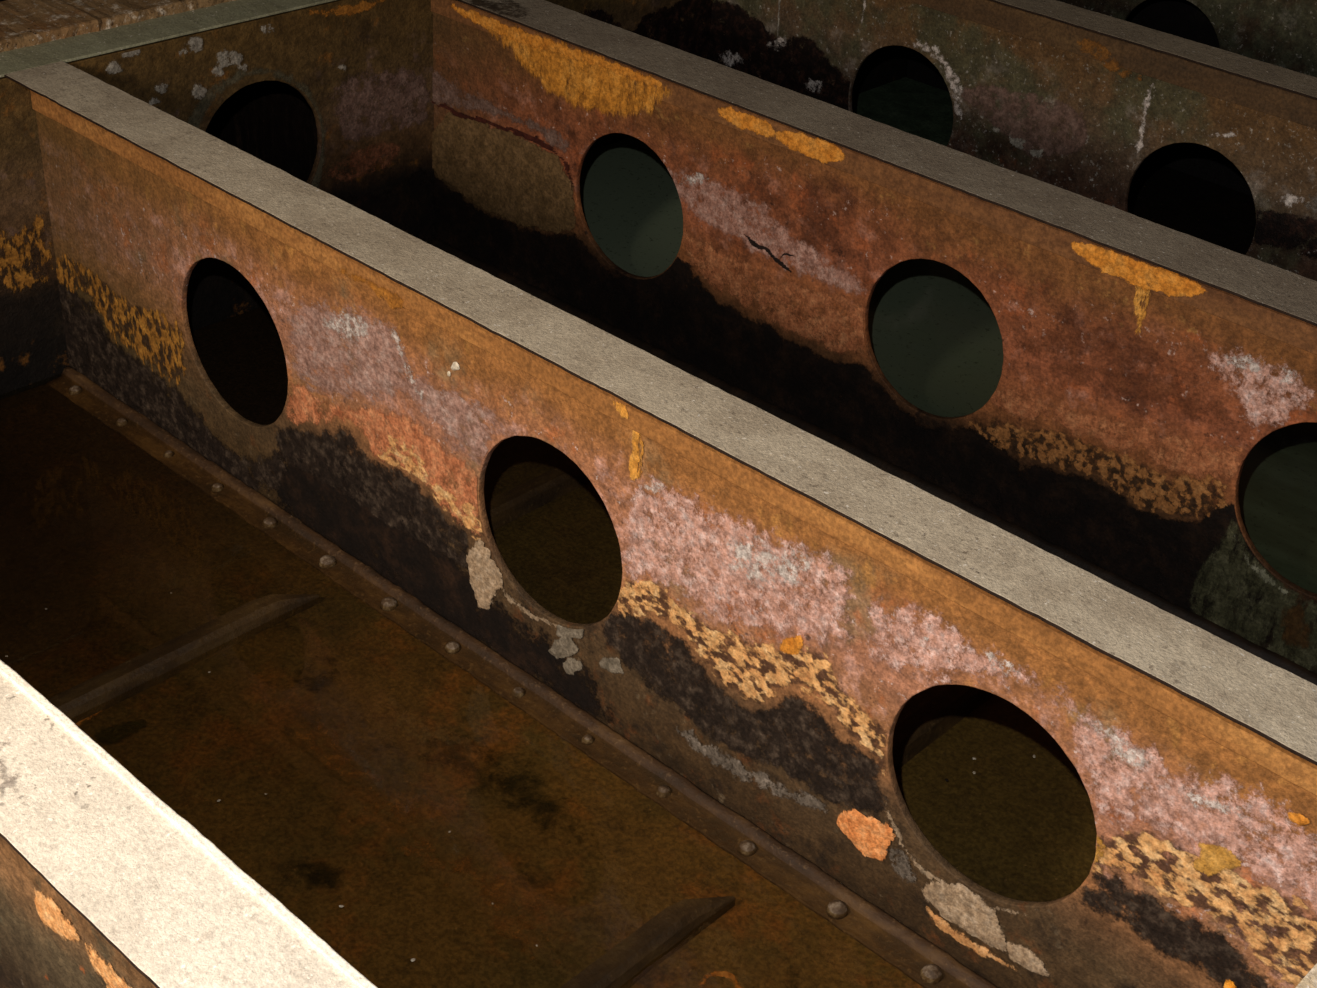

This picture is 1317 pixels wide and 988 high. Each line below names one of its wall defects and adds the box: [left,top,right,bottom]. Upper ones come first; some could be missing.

spalling [584,0,850,111]
spalling [589,133,632,151]
crack [744,234,793,273]
corrosion [1017,242,1227,423]
corrosion [286,384,482,540]
water stain [337,168,1317,670]
peeling [466,539,503,610]
corrosion [617,580,887,774]
water stain [603,475,1317,904]
corrosion [837,803,941,882]
peeling [921,879,1049,976]
corrosion [1091,830,1317,987]